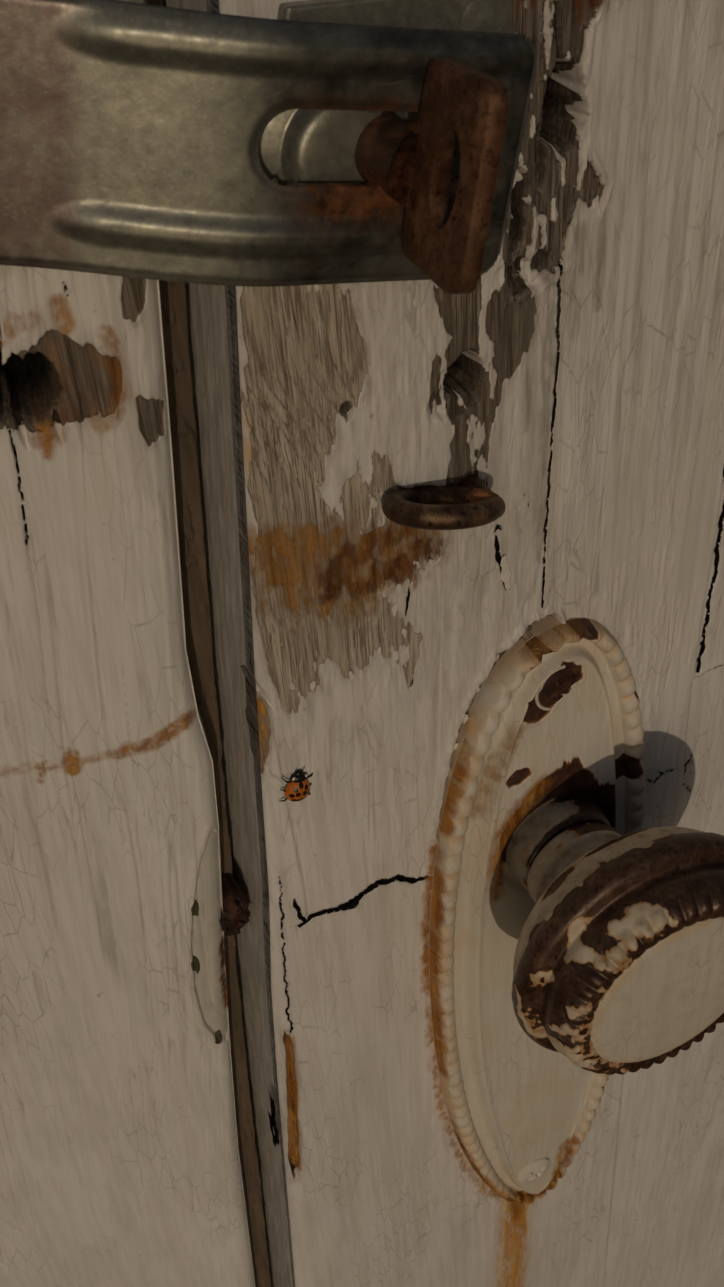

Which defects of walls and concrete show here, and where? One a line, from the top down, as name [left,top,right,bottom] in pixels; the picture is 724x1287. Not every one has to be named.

peeling [240,284,440,715]
rust [247,524,443,618]
peeling [429,262,537,486]
crack [541,233,563,609]
crack [691,469,724,686]
rust [64,751,80,775]
rust [122,714,195,753]
crack [279,875,429,1033]
rust [422,762,579,1287]